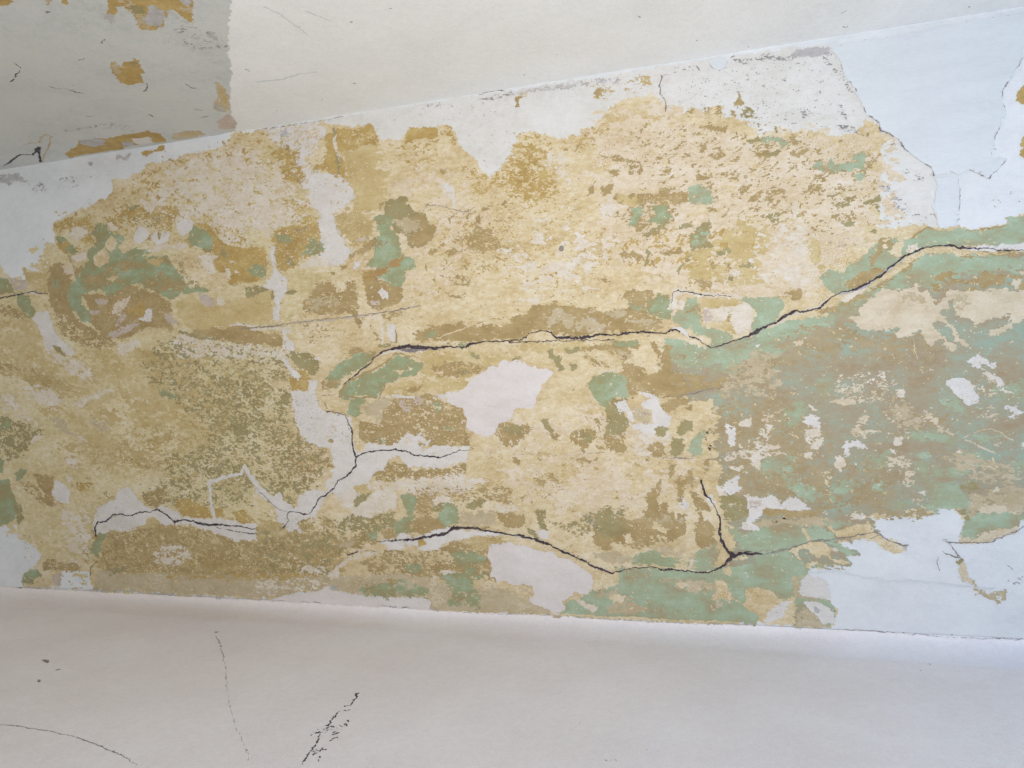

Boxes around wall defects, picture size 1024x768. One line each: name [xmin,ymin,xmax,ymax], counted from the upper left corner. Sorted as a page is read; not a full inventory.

peeling [101,0,195,31]
crack [344,58,1024,384]
peeling [0,43,1024,625]
crack [256,411,467,528]
crack [333,448,907,575]